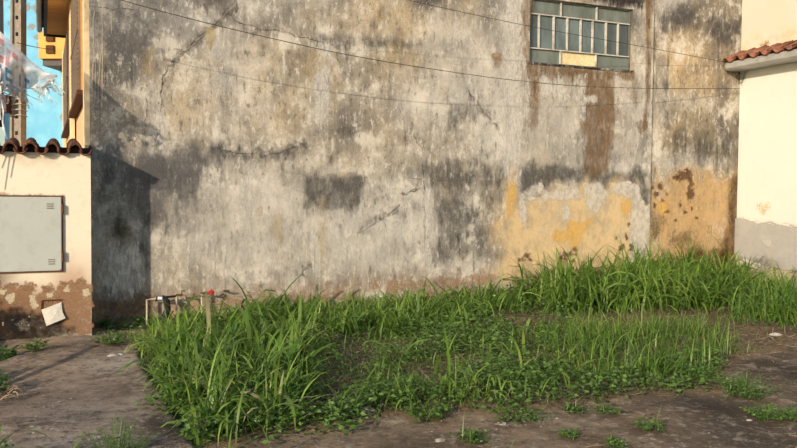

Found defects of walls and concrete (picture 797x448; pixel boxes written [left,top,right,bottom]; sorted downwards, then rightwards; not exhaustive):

peeling [386,168,797,294]